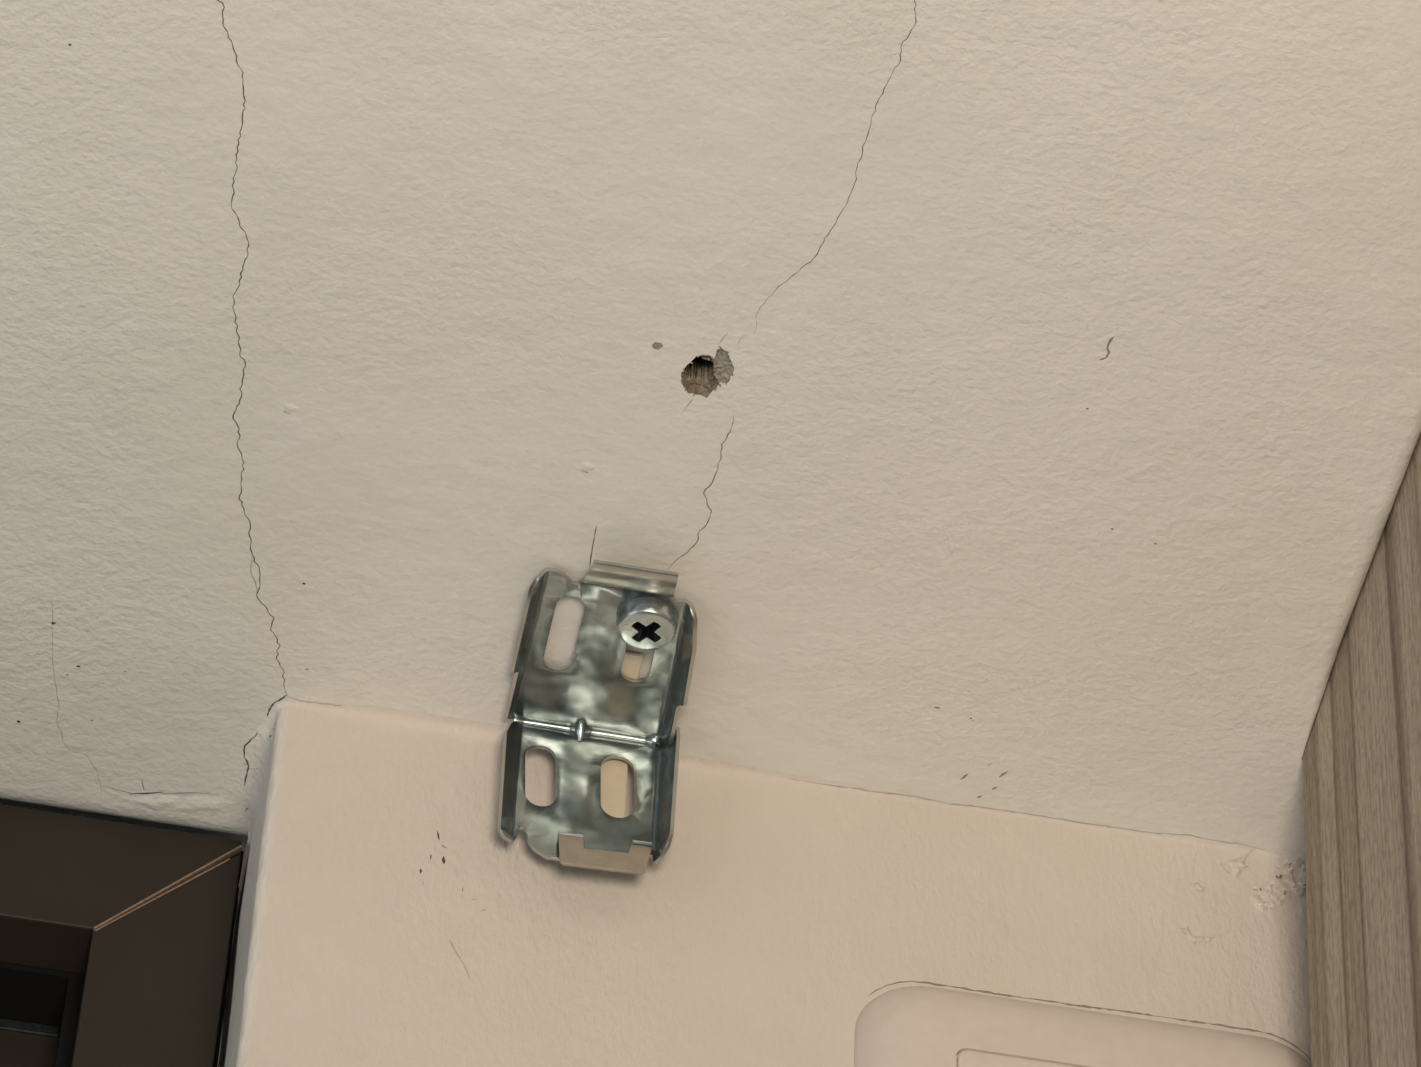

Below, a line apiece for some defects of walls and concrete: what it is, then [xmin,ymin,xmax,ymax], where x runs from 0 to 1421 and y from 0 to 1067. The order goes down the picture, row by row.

crack [720,0,917,344]
crack [217,0,342,811]
crack [670,416,734,567]
spalling [681,346,734,398]
crack [52,601,102,796]
peeling [1249,852,1306,912]